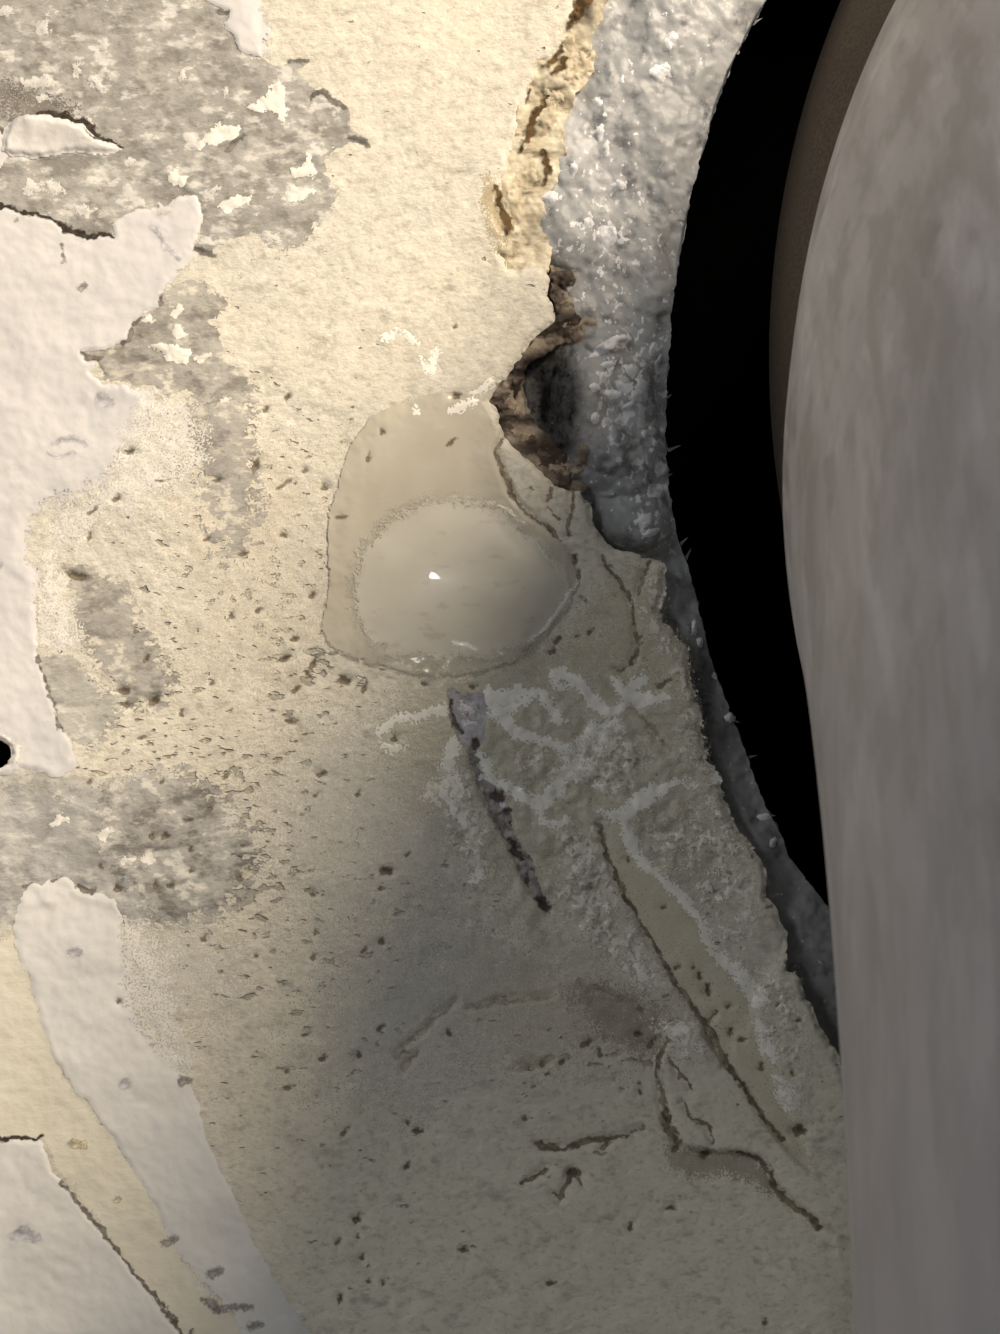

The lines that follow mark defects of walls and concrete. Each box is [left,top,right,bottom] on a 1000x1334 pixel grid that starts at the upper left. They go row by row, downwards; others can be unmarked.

leakage [122,415,815,1137]
spalling [489,0,841,1065]
crack [519,824,823,1231]